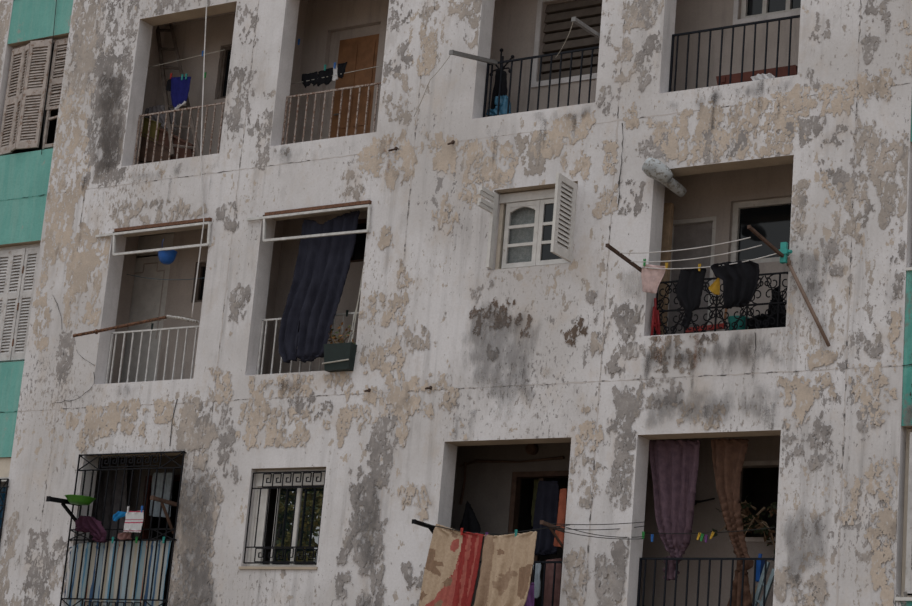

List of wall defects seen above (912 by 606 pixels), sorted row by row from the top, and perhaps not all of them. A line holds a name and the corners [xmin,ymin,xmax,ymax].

water stain [99,76,122,168]
peeling [226,66,273,171]
peeling [342,0,912,474]
peeling [60,258,468,606]
peeling [560,299,726,510]
peeling [0,511,69,606]
peeling [562,537,629,606]